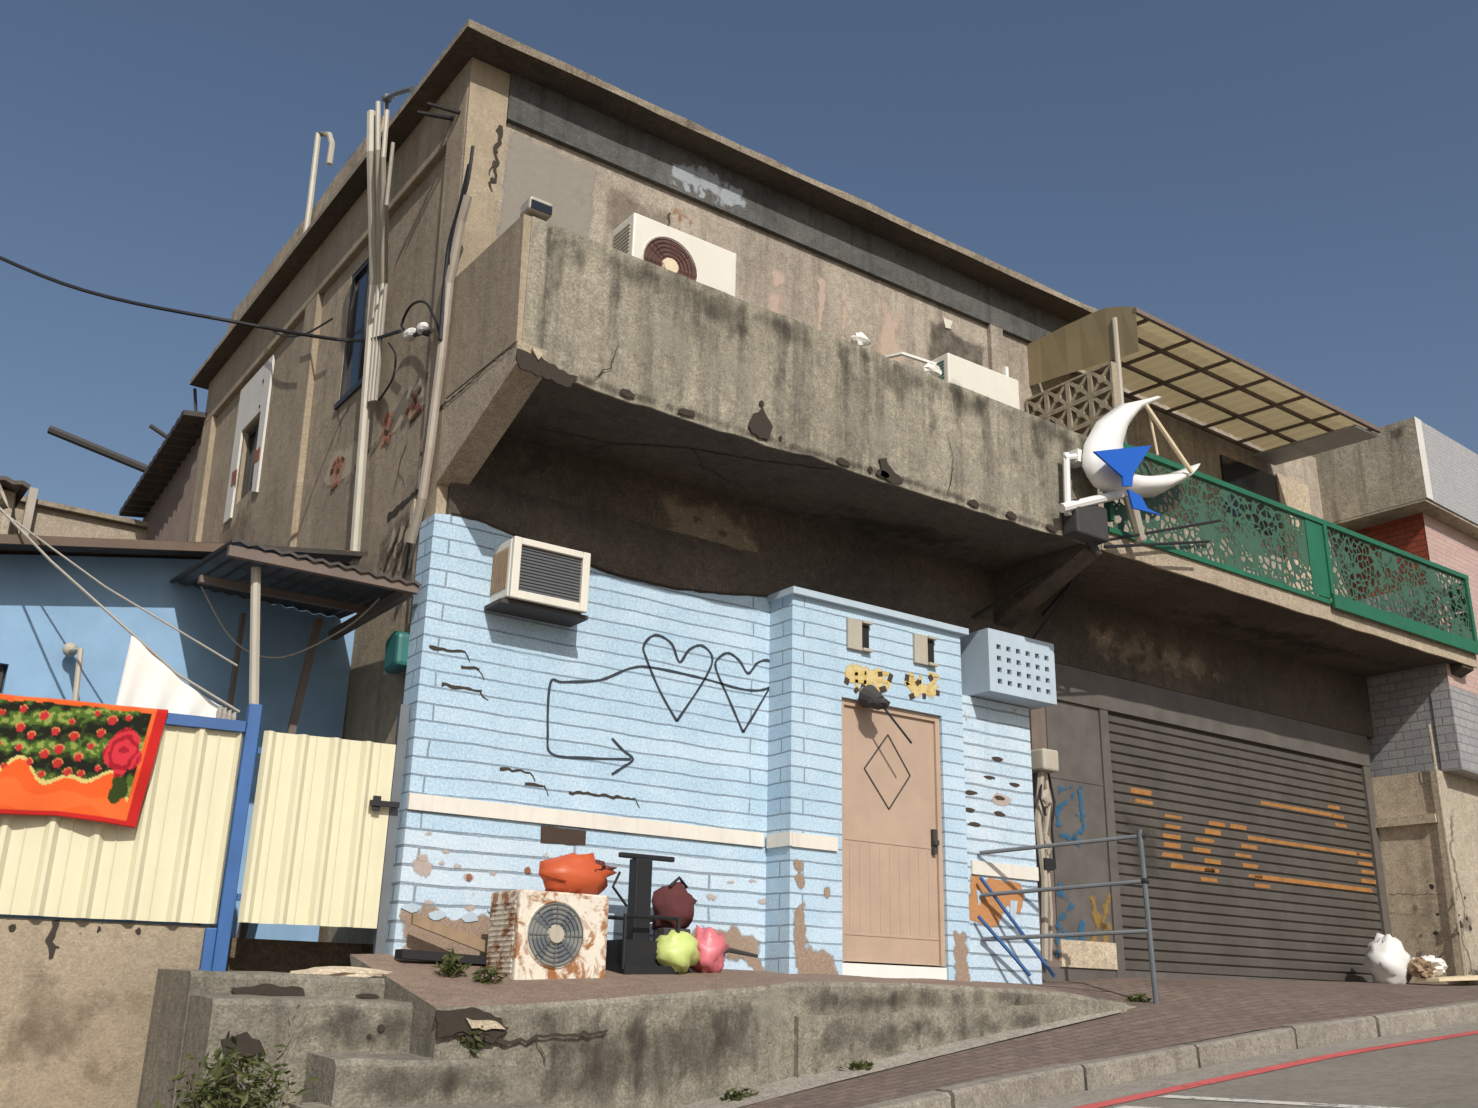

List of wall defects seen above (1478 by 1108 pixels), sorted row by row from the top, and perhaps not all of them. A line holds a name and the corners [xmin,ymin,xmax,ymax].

peeling [672,164,746,207]
damp [930,317,982,366]
peeling [324,376,428,490]
peeling [413,849,497,881]
peeling [400,900,490,956]
peeling [793,859,838,975]